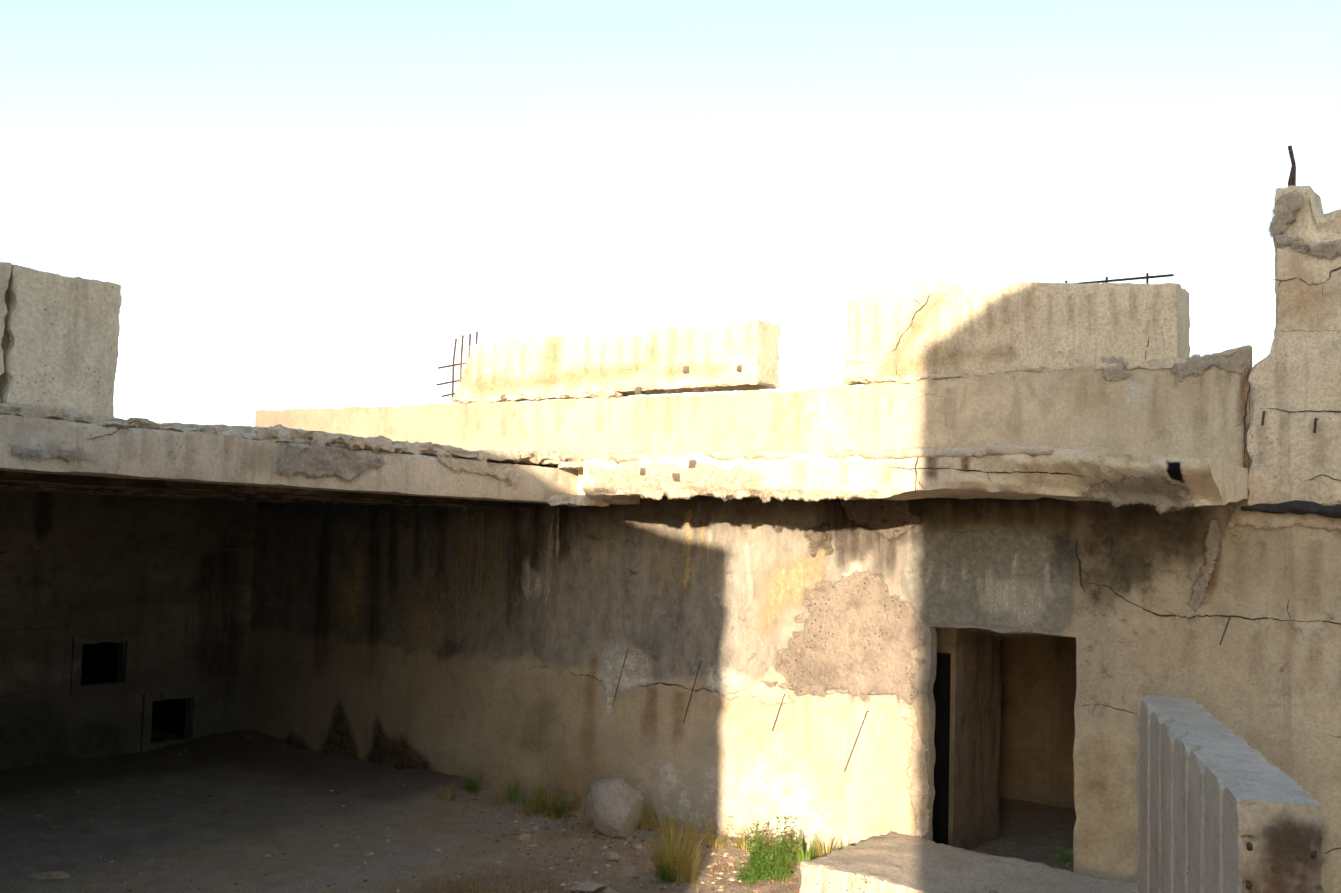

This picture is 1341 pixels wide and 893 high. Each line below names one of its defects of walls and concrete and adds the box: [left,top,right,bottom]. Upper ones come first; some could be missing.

spalling [1267,145,1341,260]
crack [845,292,940,401]
spalling [12,444,92,462]
spalling [437,454,523,487]
spalling [1082,461,1194,515]
leakage [662,509,710,592]
spalling [804,524,833,557]
leakage [768,500,895,624]
crack [1075,537,1341,625]
flaking render [747,569,931,838]